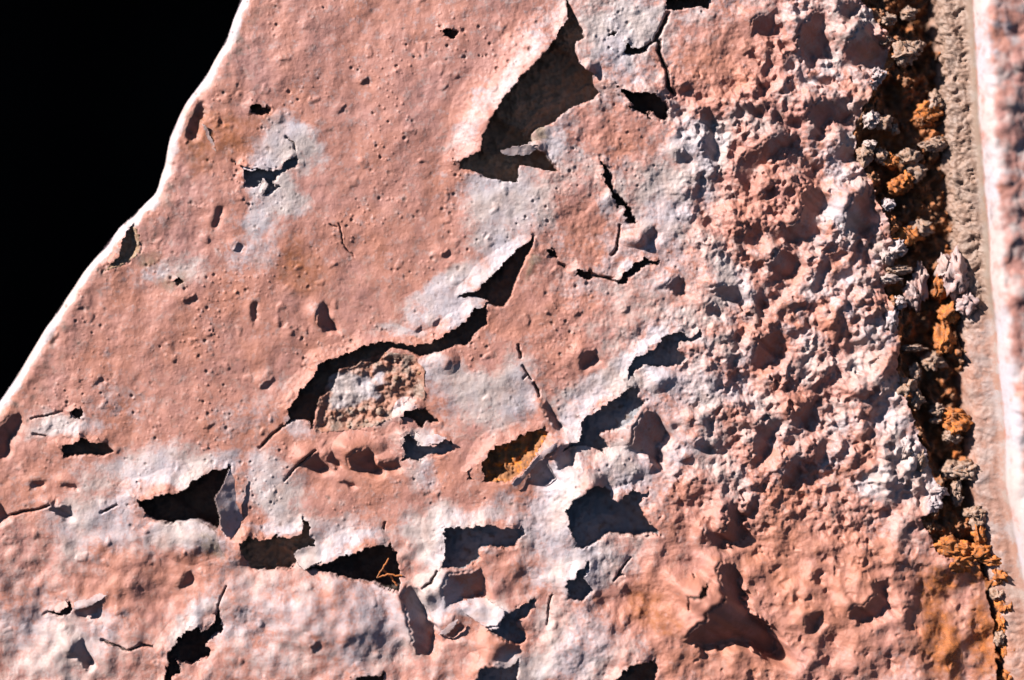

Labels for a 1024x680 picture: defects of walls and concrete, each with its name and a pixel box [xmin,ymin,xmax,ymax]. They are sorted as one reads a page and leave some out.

peeling [442,0,668,182]
crack [645,14,674,94]
peeling [232,150,299,196]
crack [592,223,621,281]
peeling [274,233,592,462]
peeling [460,321,701,601]
peeling [115,459,402,592]
peeling [420,502,524,571]
peeling [153,605,223,680]
peeling [690,577,708,600]
corrosion [923,565,1000,680]